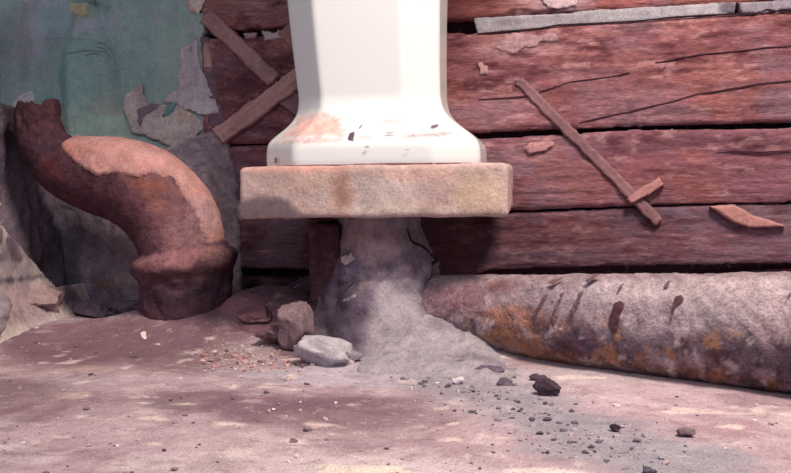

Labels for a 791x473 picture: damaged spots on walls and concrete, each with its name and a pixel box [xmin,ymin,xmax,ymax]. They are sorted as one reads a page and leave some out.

spalling [186,0,205,15]
peeling [543,0,578,9]
crack [661,45,791,62]
crack [479,72,629,100]
crack [580,80,791,123]
corrosion [282,114,339,138]
spalling [123,36,242,295]
spalling [57,198,139,313]